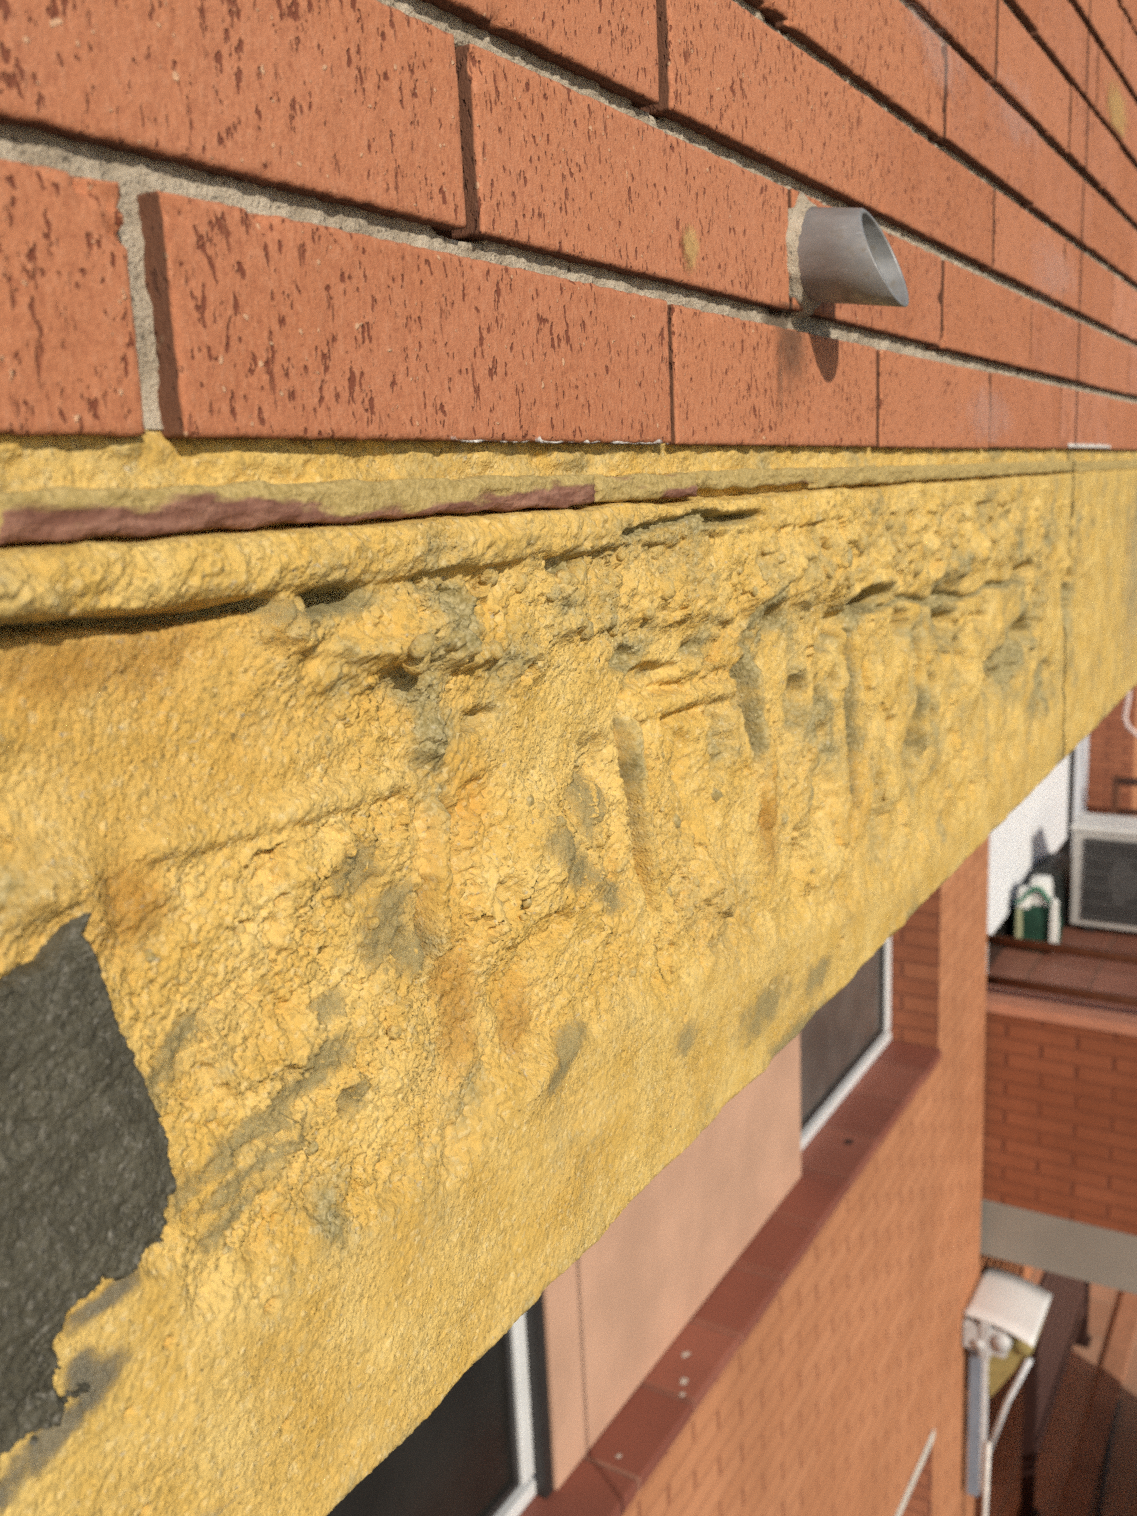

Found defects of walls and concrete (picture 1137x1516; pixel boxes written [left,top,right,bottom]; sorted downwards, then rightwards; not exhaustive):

spalling [81,493,1080,1285]